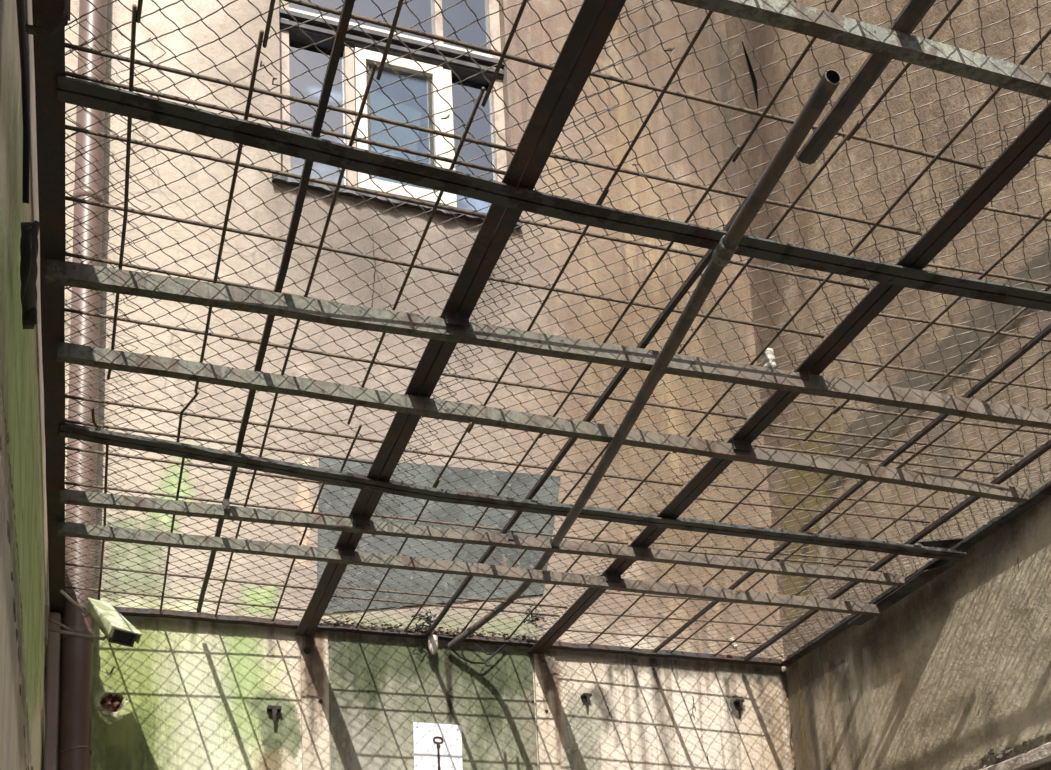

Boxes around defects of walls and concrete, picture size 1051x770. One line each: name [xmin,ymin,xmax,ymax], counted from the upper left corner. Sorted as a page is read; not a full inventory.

water stain [716,508,1036,770]
spalling [91,682,129,720]
water stain [593,686,613,728]
water stain [96,710,151,770]
water stain [265,740,281,770]